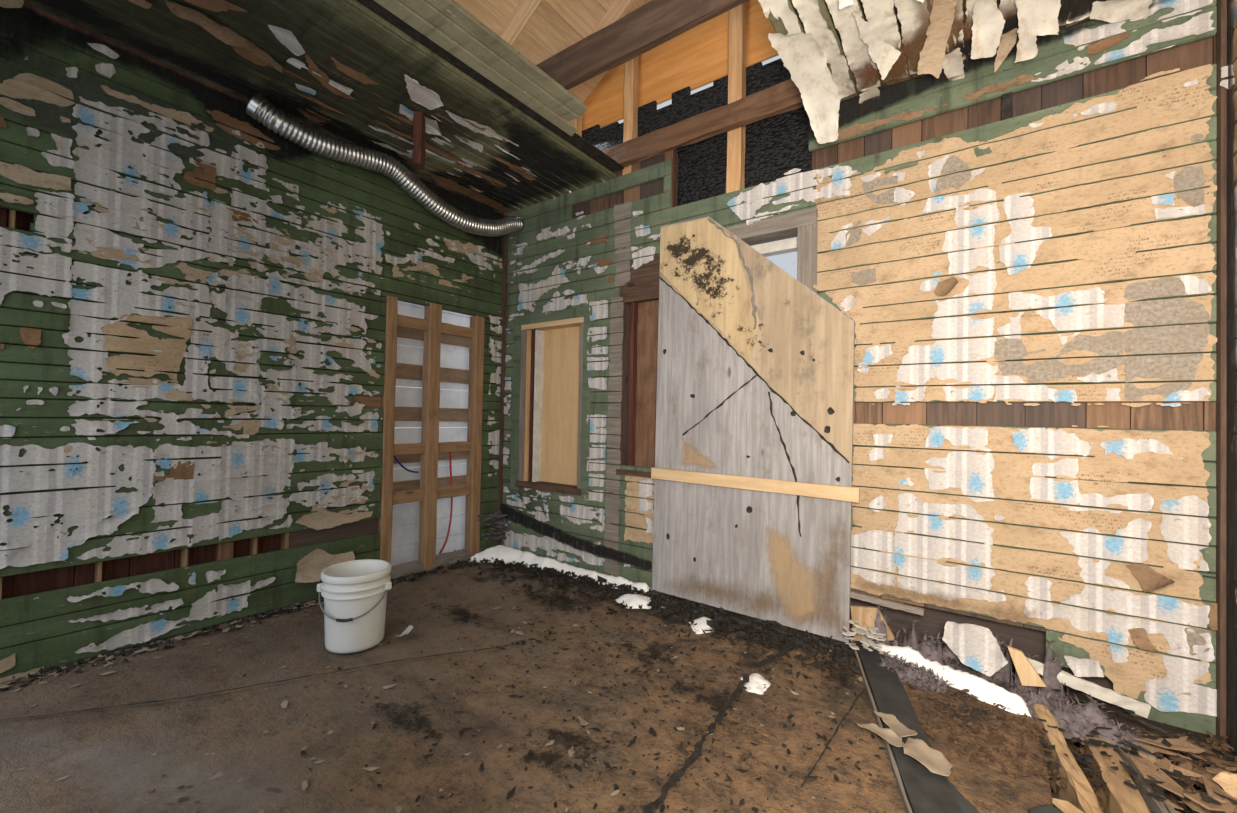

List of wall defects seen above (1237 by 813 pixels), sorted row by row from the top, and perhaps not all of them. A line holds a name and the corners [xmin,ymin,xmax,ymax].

peeling [88,43,119,59]
peeling [128,0,536,212]
peeling [746,170,905,225]
peeling [1151,171,1205,207]
peeling [902,192,1212,364]
peeling [0,96,661,577]
peeling [943,375,1025,402]
peeling [1070,353,1211,407]
peeling [850,423,1215,699]
peeling [67,570,226,623]
peeling [0,594,324,692]
peeling [842,620,886,654]